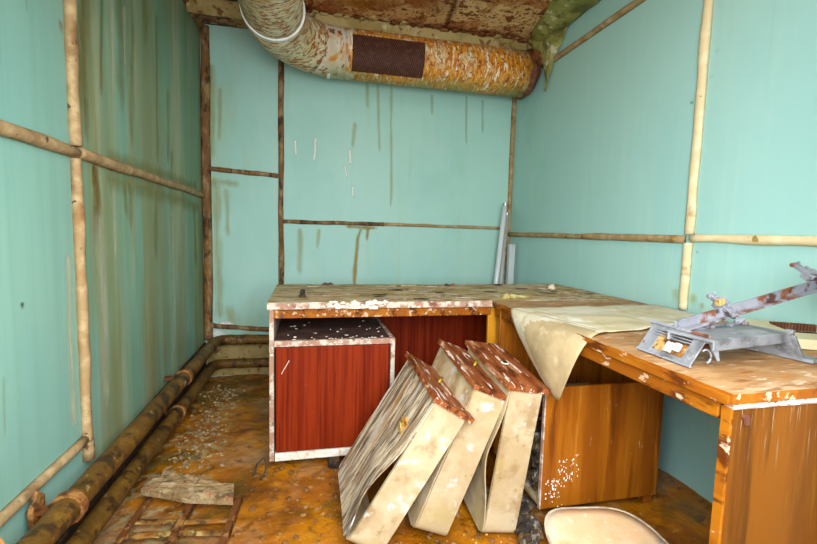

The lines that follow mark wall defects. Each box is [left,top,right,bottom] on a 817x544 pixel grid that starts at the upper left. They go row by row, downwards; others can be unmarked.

peeling [306,0,601,92]
corrosion [409,0,515,39]